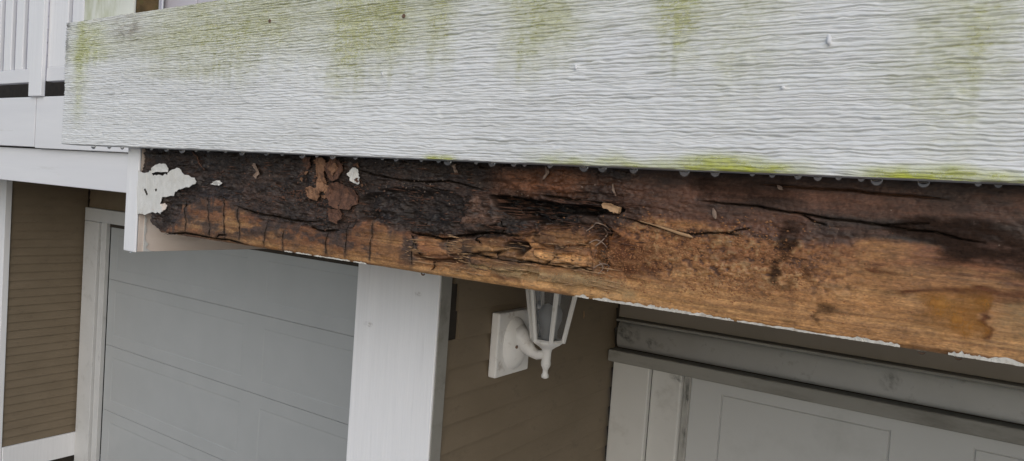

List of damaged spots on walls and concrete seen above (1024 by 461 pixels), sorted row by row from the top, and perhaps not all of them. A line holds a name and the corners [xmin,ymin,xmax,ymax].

peeling [137,163,196,215]
peeling [300,157,363,224]
damp [685,158,783,199]
crack [543,184,982,243]
damp [877,169,973,181]
damp [901,286,1024,339]